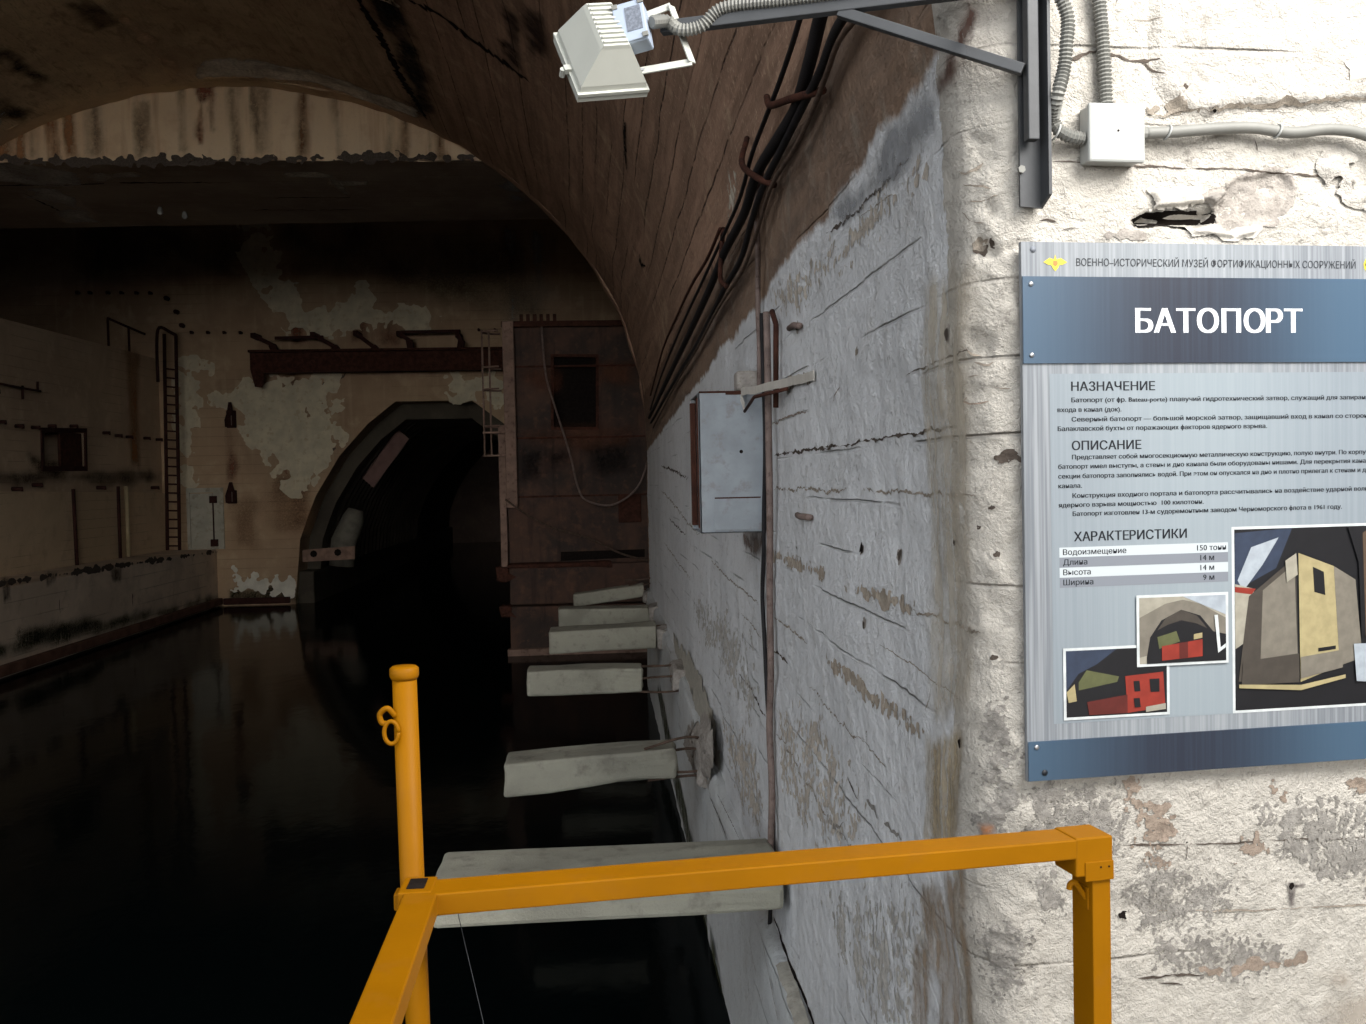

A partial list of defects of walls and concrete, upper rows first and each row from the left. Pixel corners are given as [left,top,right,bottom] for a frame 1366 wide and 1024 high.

crack [357,0,427,119]
crack [409,0,530,83]
corrosion [46,114,74,155]
spalling [1104,167,1297,242]
peeling [235,224,442,340]
peeling [171,354,349,499]
crack [774,347,1010,498]
leakage [0,597,215,656]
leakage [230,565,298,600]
peeling [683,589,776,838]
peeling [779,700,872,849]